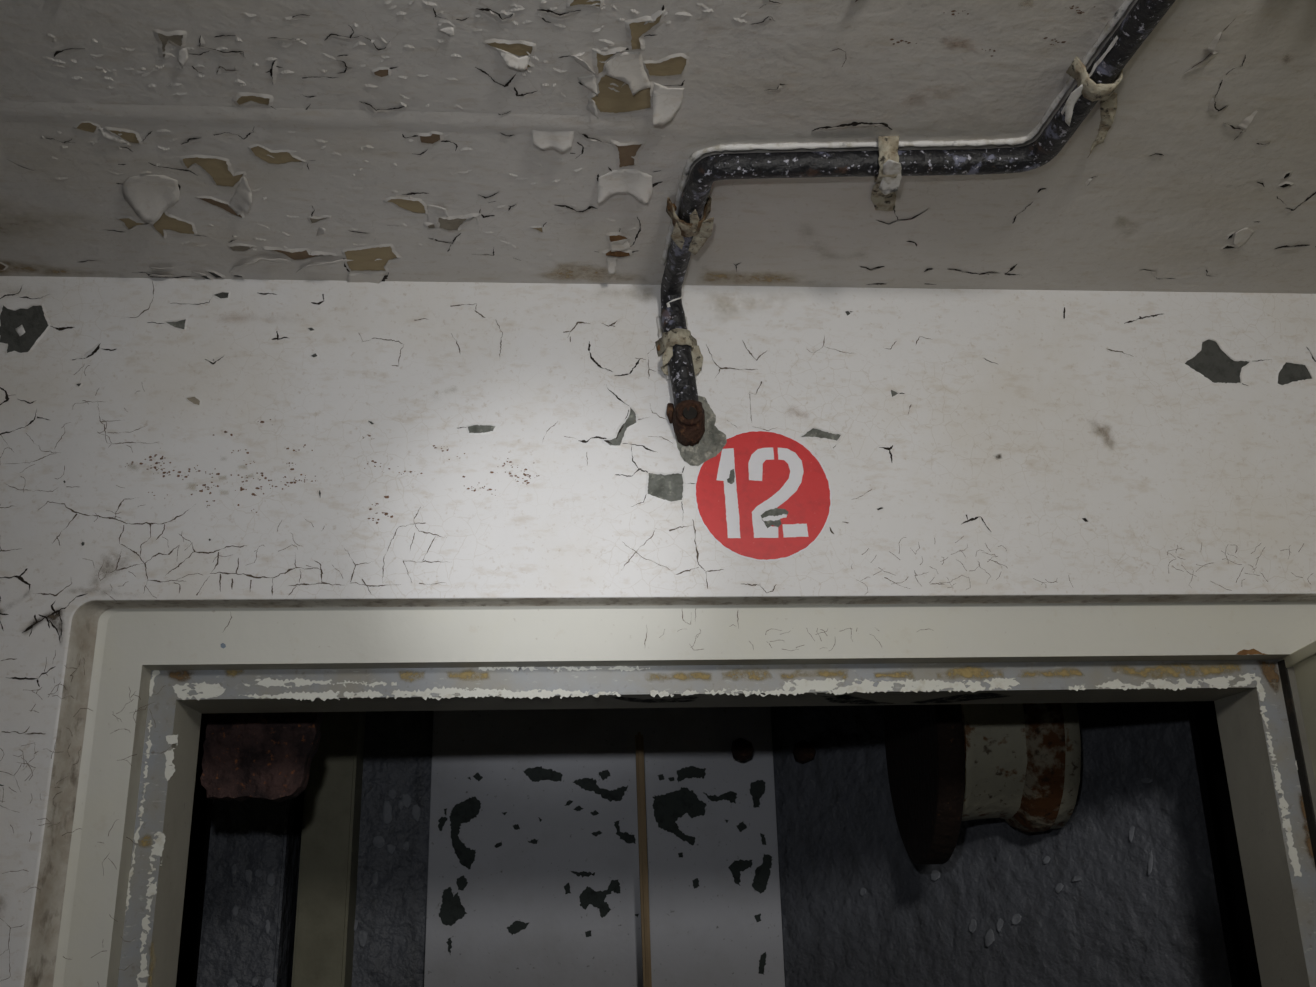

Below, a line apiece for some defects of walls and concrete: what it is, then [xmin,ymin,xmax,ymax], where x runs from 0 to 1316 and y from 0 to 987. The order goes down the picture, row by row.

peeling [472,0,713,137]
peeling [41,120,402,331]
spalling [0,287,74,355]
spalling [1182,338,1314,387]
spalling [578,389,695,513]
crack [0,343,444,892]
peeling [243,677,621,701]
peeling [650,678,1020,697]
peeling [524,766,636,844]
peeling [652,766,766,858]
peeling [1069,673,1302,877]
peeling [438,797,481,953]